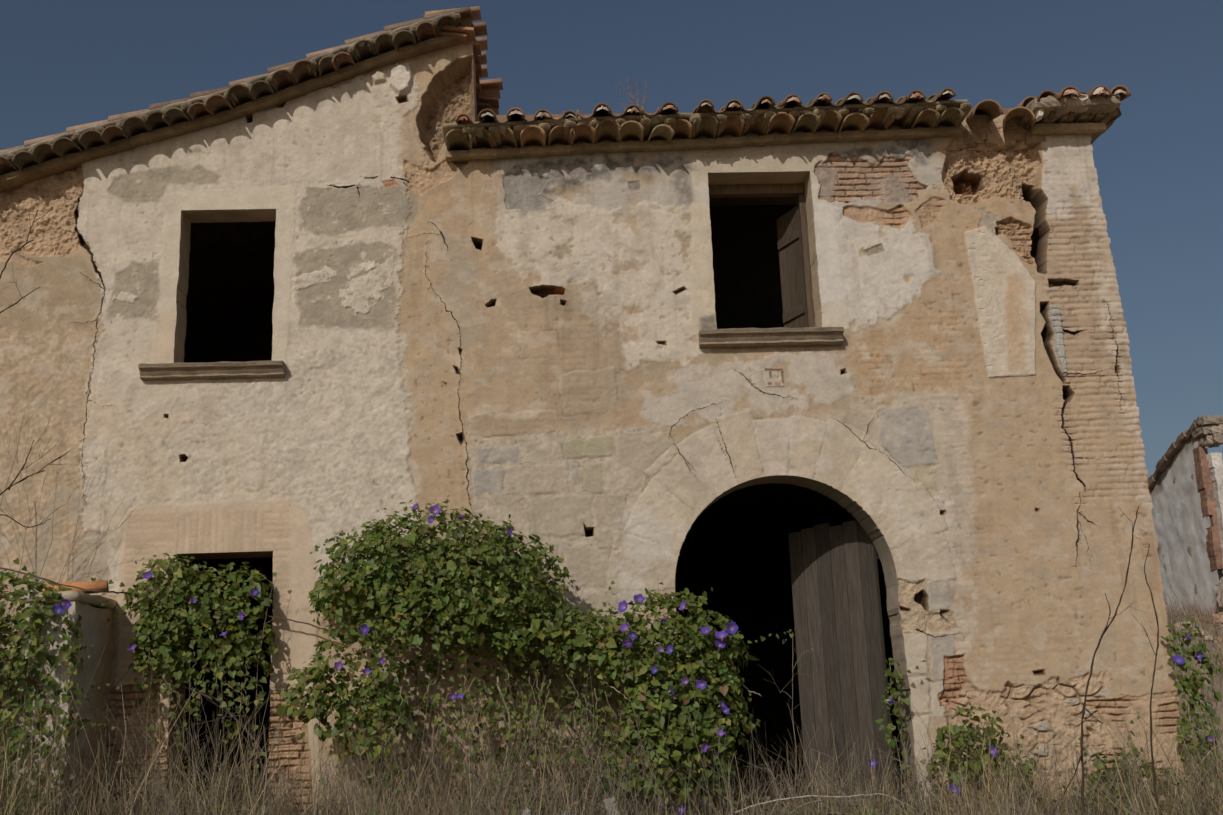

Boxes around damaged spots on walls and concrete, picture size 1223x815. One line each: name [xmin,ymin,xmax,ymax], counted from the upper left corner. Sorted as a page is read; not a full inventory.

crack [65,190,119,511]
spalling [0,144,227,274]
peeling [283,52,480,339]
crack [323,172,476,527]
crack [664,363,800,484]
crack [829,404,910,480]
flaking render [807,121,1049,381]
flaking render [897,574,1189,815]